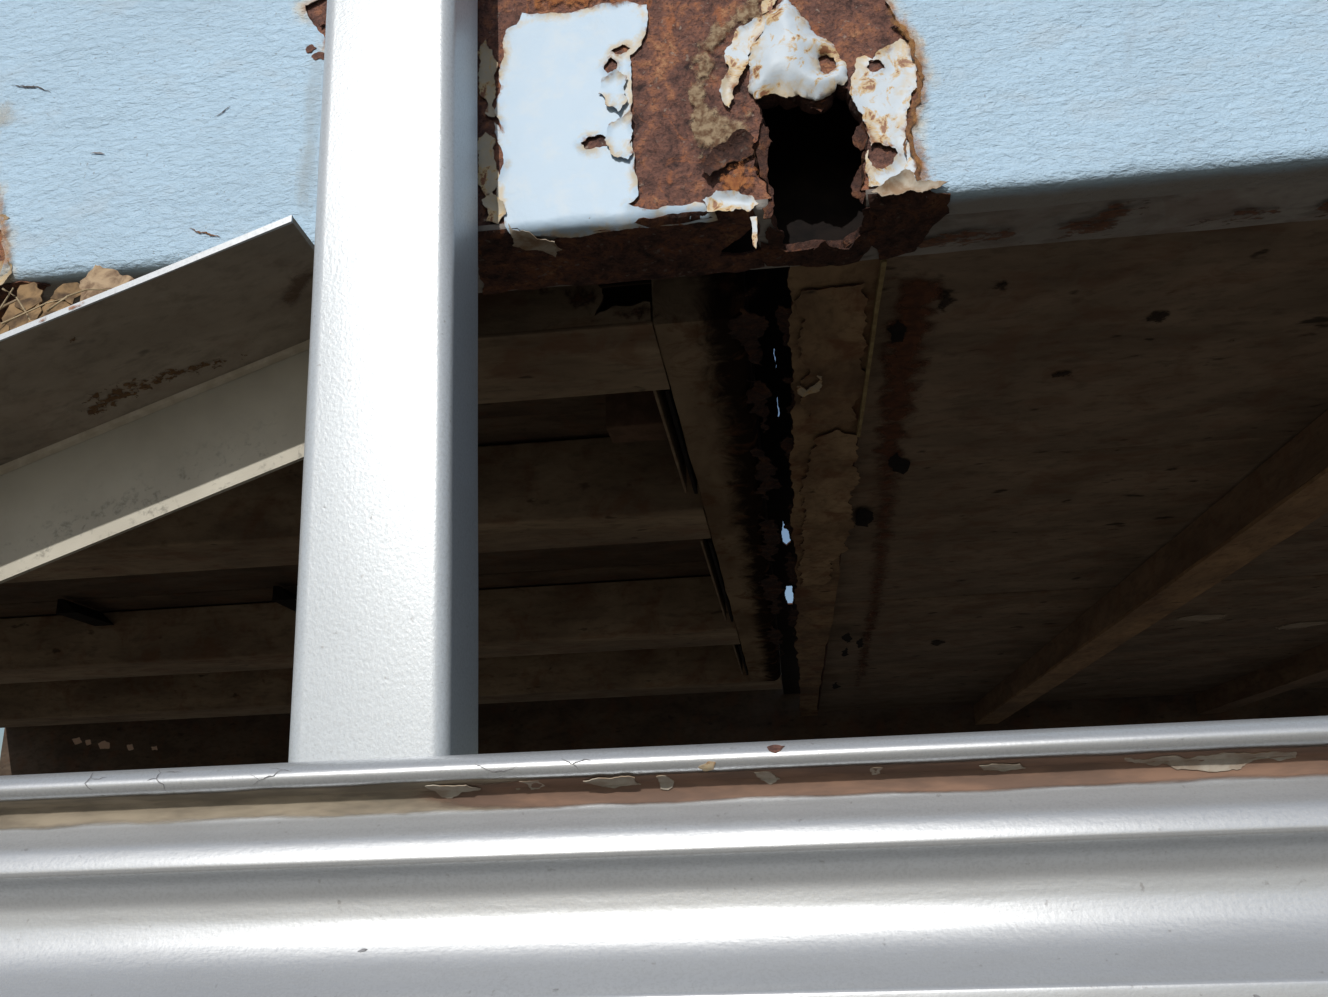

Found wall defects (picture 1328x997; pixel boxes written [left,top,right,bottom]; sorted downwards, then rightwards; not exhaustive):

peeling [477,0,762,248]
corrosion [477,0,1016,295]
peeling [849,38,948,197]
corrosion [0,202,51,323]
corrosion [84,356,226,415]